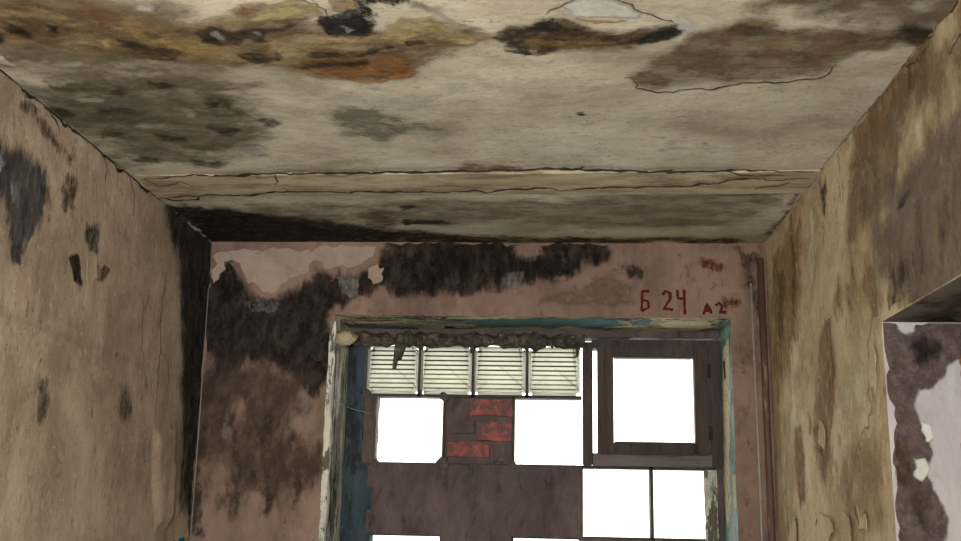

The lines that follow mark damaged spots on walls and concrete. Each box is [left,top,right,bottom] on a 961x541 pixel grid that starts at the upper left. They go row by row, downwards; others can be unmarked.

peeling [546,0,694,32]
water stain [0,0,685,168]
crack [0,0,961,241]
water stain [0,143,50,265]
water stain [63,174,78,212]
water stain [85,225,99,253]
water stain [361,194,776,229]
water stain [624,0,961,541]
spalling [354,317,726,369]
water stain [187,355,323,541]
peeling [703,339,737,541]
peeling [811,506,867,541]